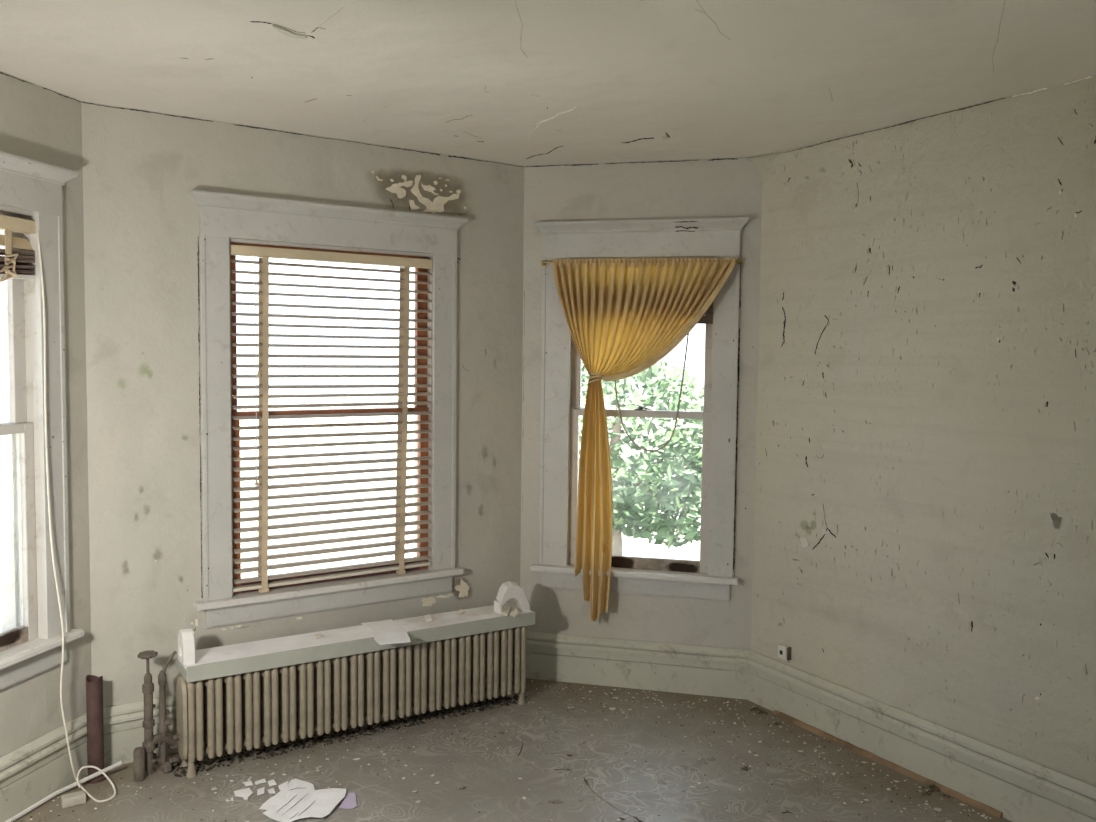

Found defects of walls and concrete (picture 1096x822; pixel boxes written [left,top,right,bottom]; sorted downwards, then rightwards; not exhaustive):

crack [250,7,344,40]
crack [0,72,737,167]
peeling [371,171,467,215]
crack [800,504,838,550]
flaking render [1050,513,1063,530]